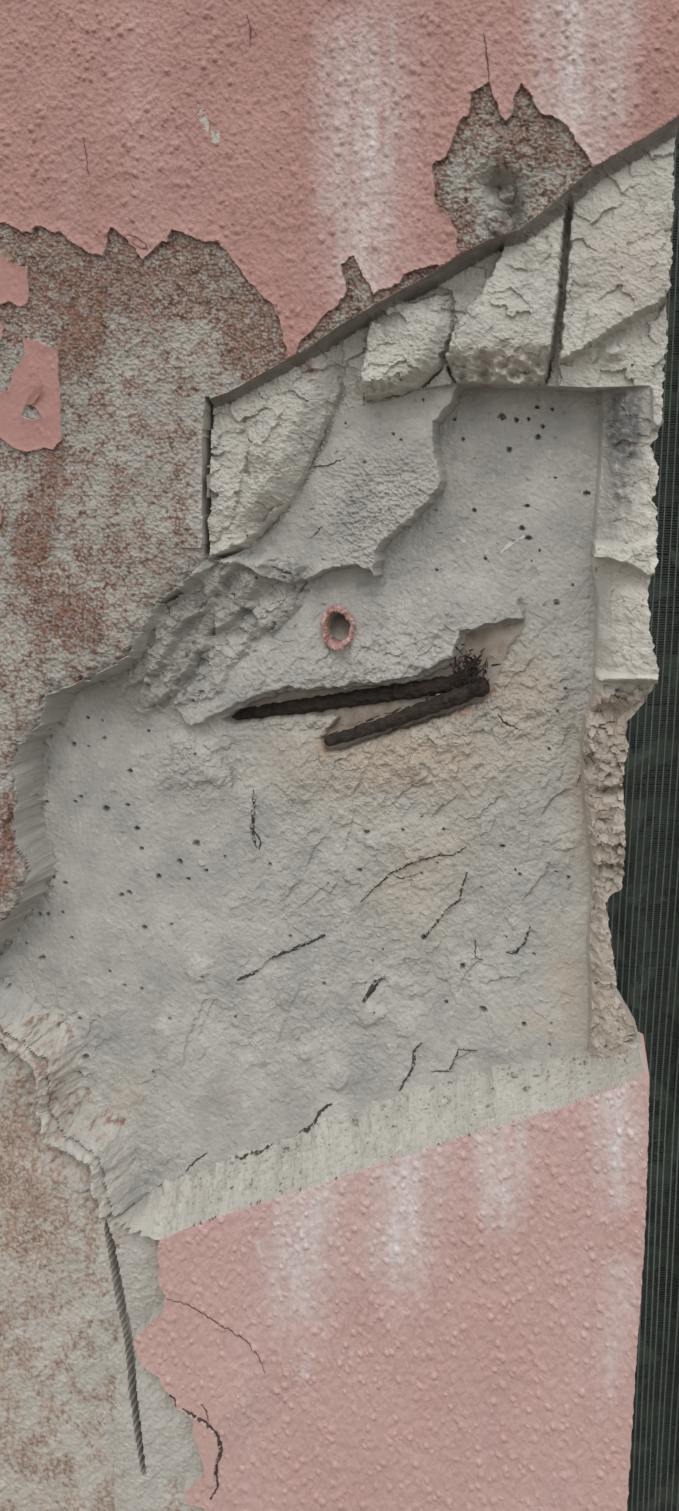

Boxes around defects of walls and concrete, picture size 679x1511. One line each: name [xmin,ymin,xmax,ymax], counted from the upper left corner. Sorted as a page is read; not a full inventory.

spalling [0,82,676,1240]
rust [209,642,582,929]
crack [167,1299,265,1373]